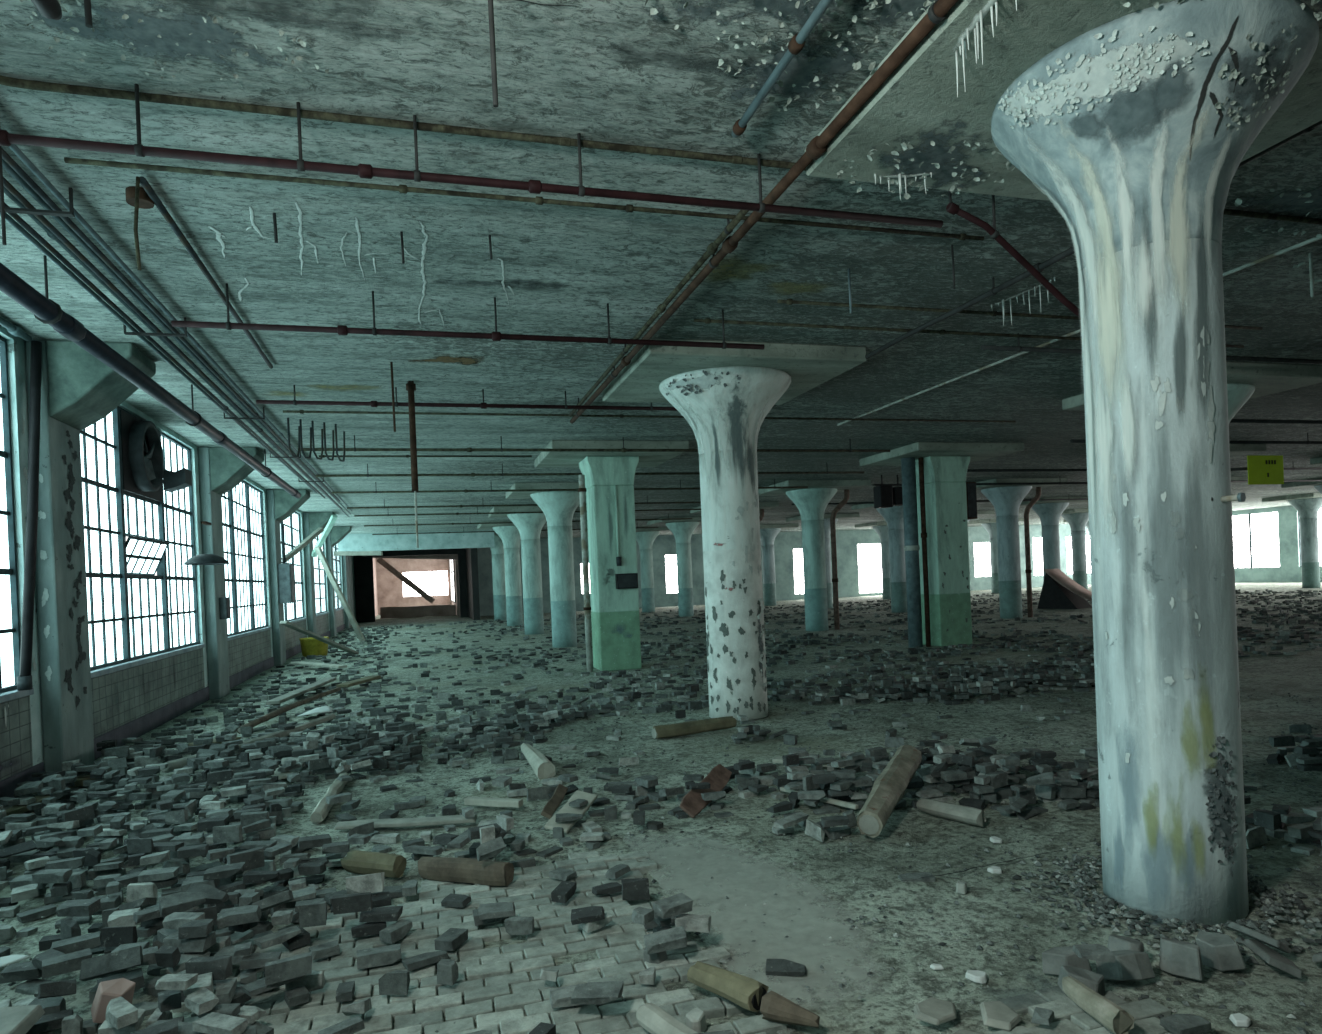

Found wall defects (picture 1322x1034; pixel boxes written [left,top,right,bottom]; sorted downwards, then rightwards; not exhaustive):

crack [517,0,577,8]
peeling [645,0,935,115]
leakage [955,0,1017,97]
peeling [998,26,1210,140]
crack [1189,16,1239,159]
peeling [1215,23,1301,131]
peeling [1300,0,1322,21]
peeling [837,122,1017,199]
leakage [1041,129,1230,525]
peeling [705,528,767,714]
spalling [1204,736,1238,877]